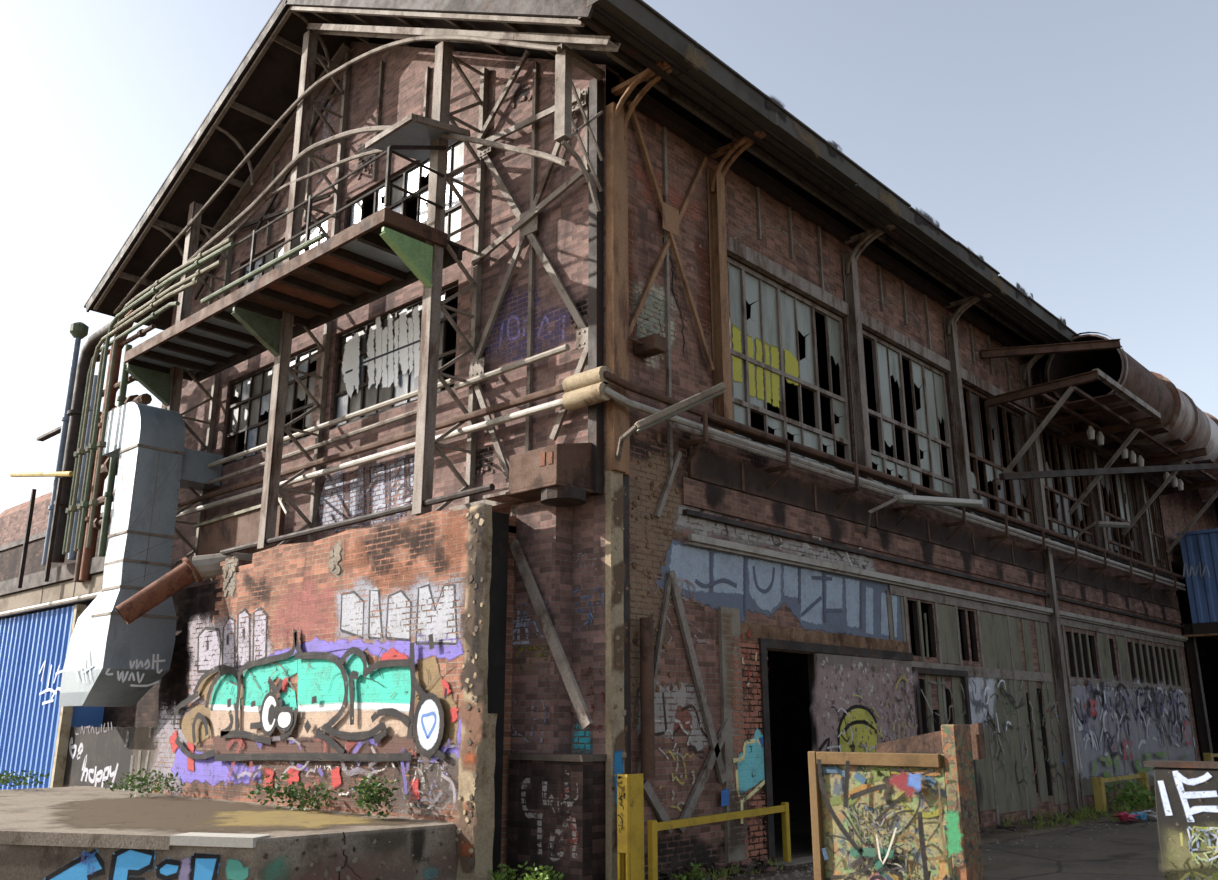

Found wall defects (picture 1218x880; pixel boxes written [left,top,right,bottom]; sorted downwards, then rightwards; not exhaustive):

peeling [373,508,485,880]